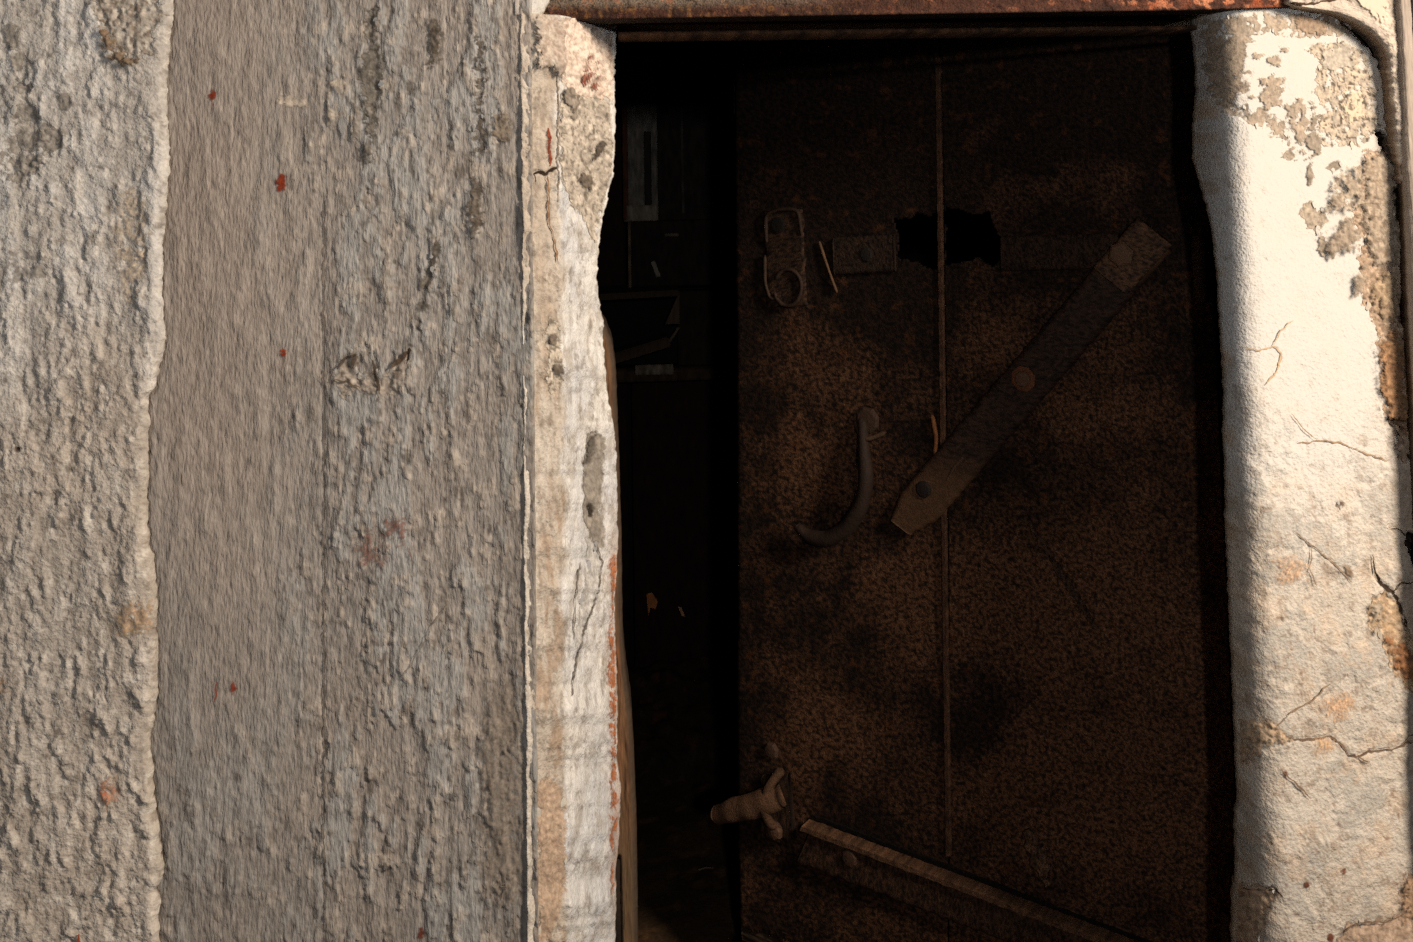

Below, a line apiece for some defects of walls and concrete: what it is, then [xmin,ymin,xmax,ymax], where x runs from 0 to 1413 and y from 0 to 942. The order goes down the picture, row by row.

flaking render [1200,10,1410,464]
crack [1294,527,1413,641]
crack [1239,684,1413,799]